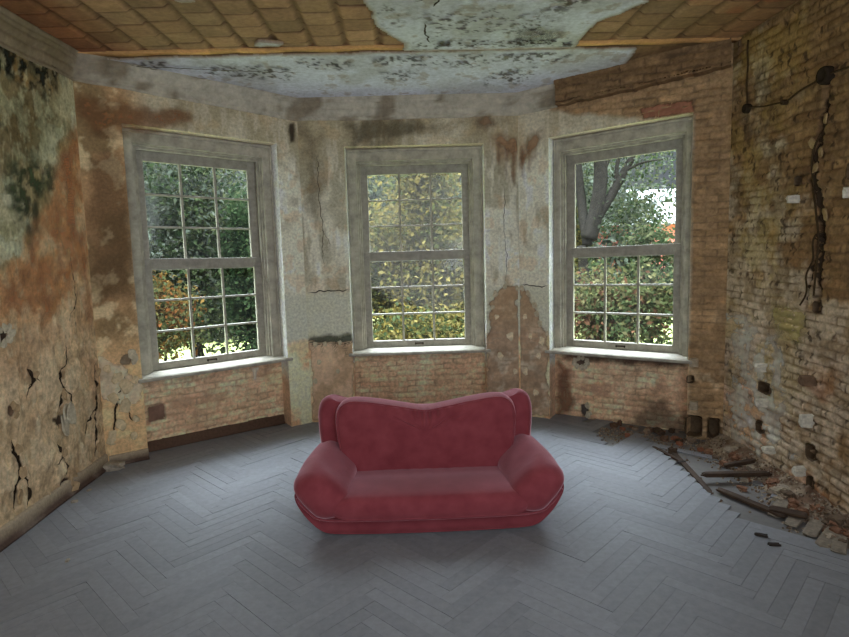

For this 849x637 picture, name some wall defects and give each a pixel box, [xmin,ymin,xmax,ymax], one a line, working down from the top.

leakage [0,46,57,90]
peeling [107,0,649,98]
leakage [349,120,424,142]
flaking render [640,101,694,119]
leakage [6,149,83,279]
crack [26,257,77,407]
leakage [309,333,352,345]
peeling [486,284,551,416]
crack [85,365,133,453]
crack [11,440,32,508]
crack [57,445,69,474]
peeling [754,532,782,547]